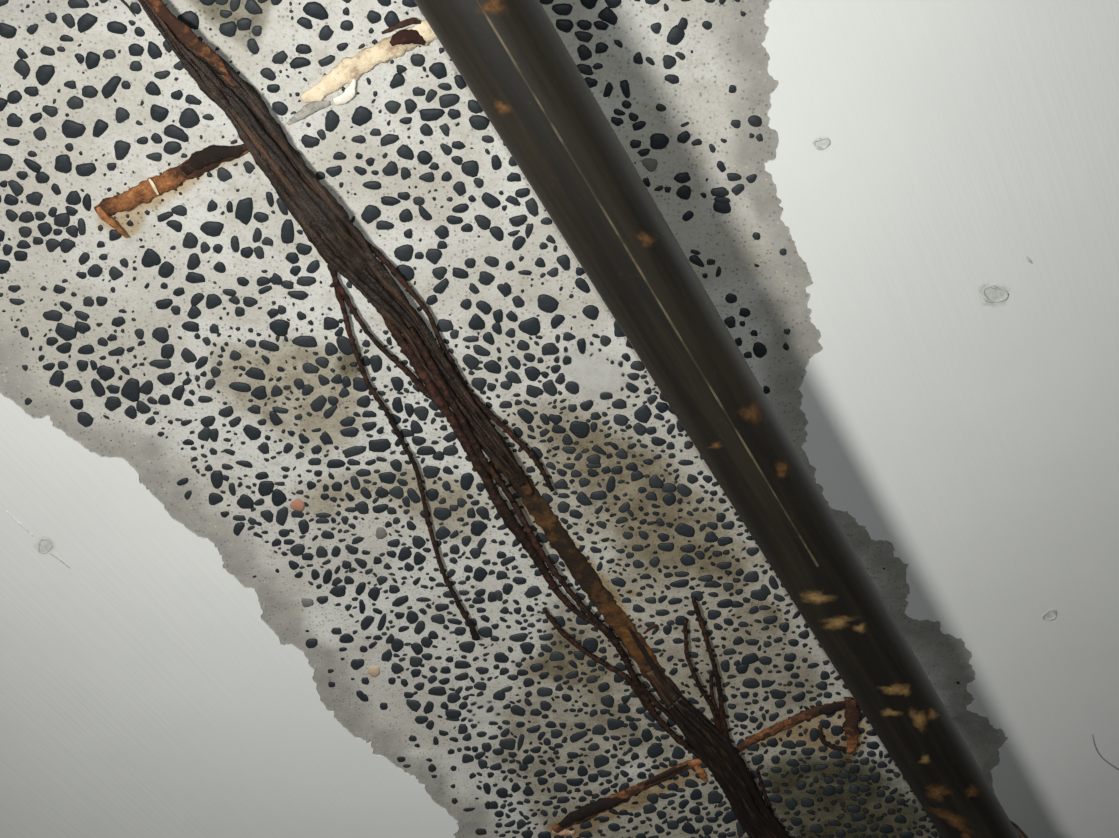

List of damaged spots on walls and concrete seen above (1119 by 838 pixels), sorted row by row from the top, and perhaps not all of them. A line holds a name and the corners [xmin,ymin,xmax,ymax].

rust [145,0,235,87]
rust [381,18,426,46]
rust [94,144,249,238]
spalling [162,0,1008,838]
rust [508,465,690,703]
rust [806,593,826,602]
rust [829,617,864,631]
rust [737,697,861,754]
rust [552,759,708,836]